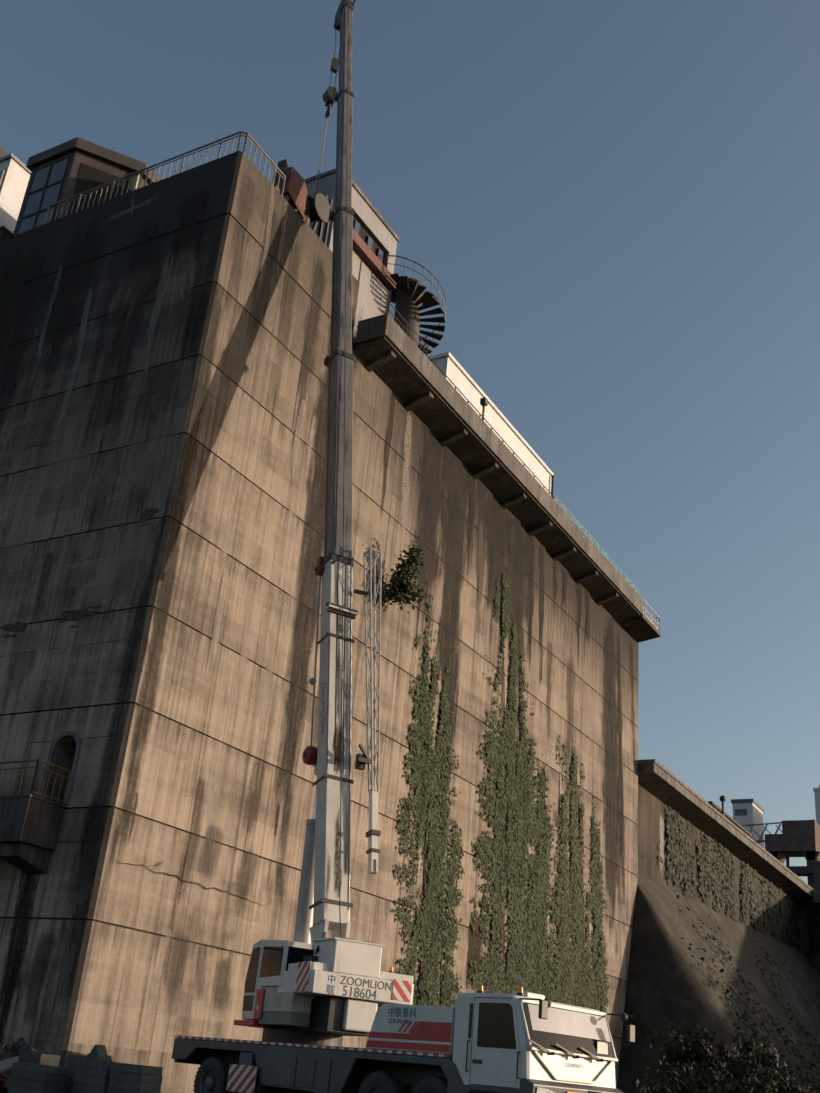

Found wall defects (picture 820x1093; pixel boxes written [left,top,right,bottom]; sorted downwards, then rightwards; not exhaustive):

water stain [275,262,328,846]
water stain [414,423,590,816]
water stain [603,616,635,942]